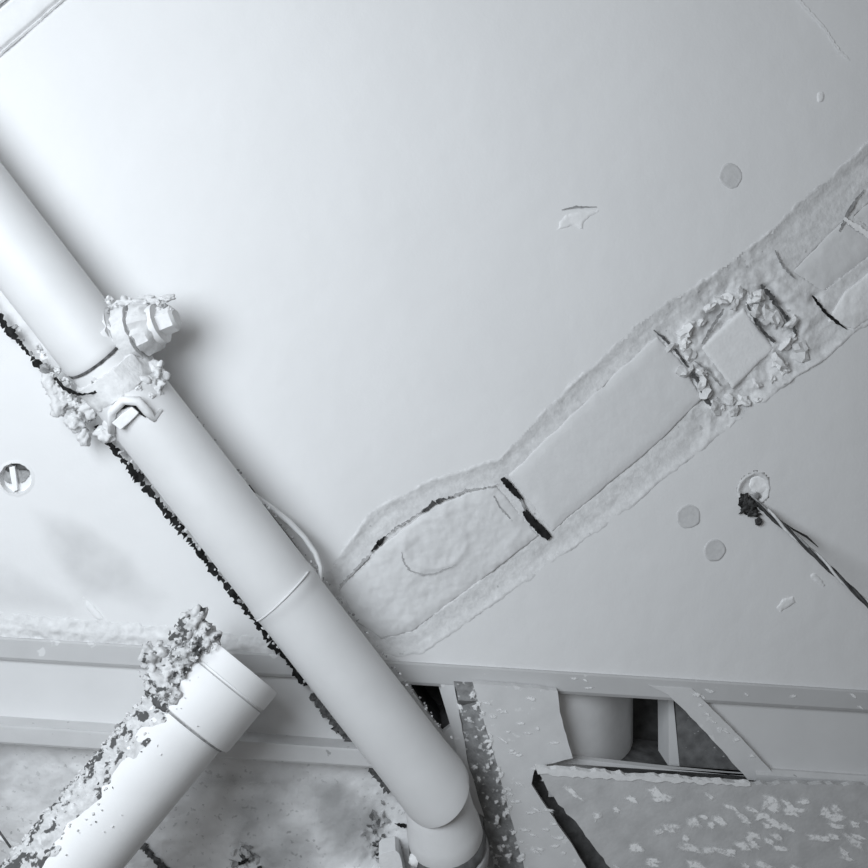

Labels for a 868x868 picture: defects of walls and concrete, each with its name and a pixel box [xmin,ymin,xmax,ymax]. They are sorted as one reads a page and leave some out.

crack [839,190,864,232]
crack [775,250,794,278]
crack [0,313,43,369]
crack [653,309,724,406]
crack [746,284,797,343]
crack [812,295,847,329]
flaking render [323,142,868,661]
crack [339,477,552,588]
crack [94,424,352,742]
flaking render [0,612,174,647]
flaking render [220,633,280,654]
crack [368,768,391,794]